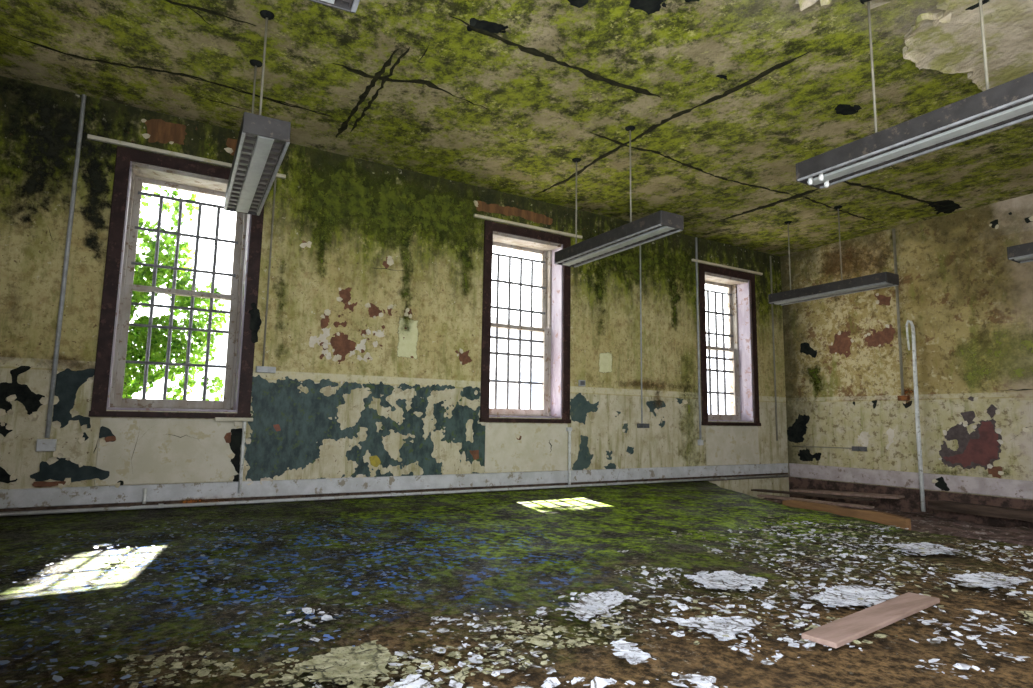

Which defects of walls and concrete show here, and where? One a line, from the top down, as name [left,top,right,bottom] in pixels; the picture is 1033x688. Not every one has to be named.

damp [467,18,508,33]
damp [567,0,589,8]
damp [629,0,666,15]
peeling [902,0,1033,91]
crack [450,16,877,223]
damp [834,104,862,115]
damp [0,79,132,259]
crack [844,181,951,208]
peeling [0,366,116,446]
peeling [0,450,124,489]
peeling [224,375,492,485]
flaking render [932,396,1004,491]